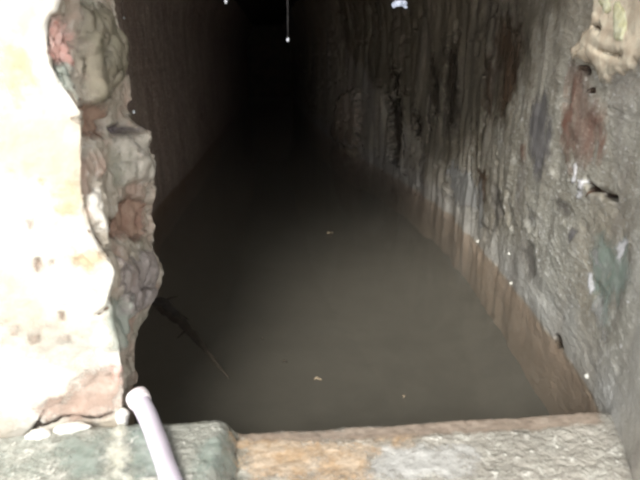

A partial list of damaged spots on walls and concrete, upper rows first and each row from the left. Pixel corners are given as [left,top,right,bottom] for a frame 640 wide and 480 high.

spalling [47,19,75,92]
spalling [79,103,107,137]
water stain [431,46,460,128]
water stain [495,18,522,115]
spalling [570,0,640,82]
spalling [108,194,147,242]
water stain [446,161,505,229]
water stain [525,246,535,279]
spalling [32,366,124,422]